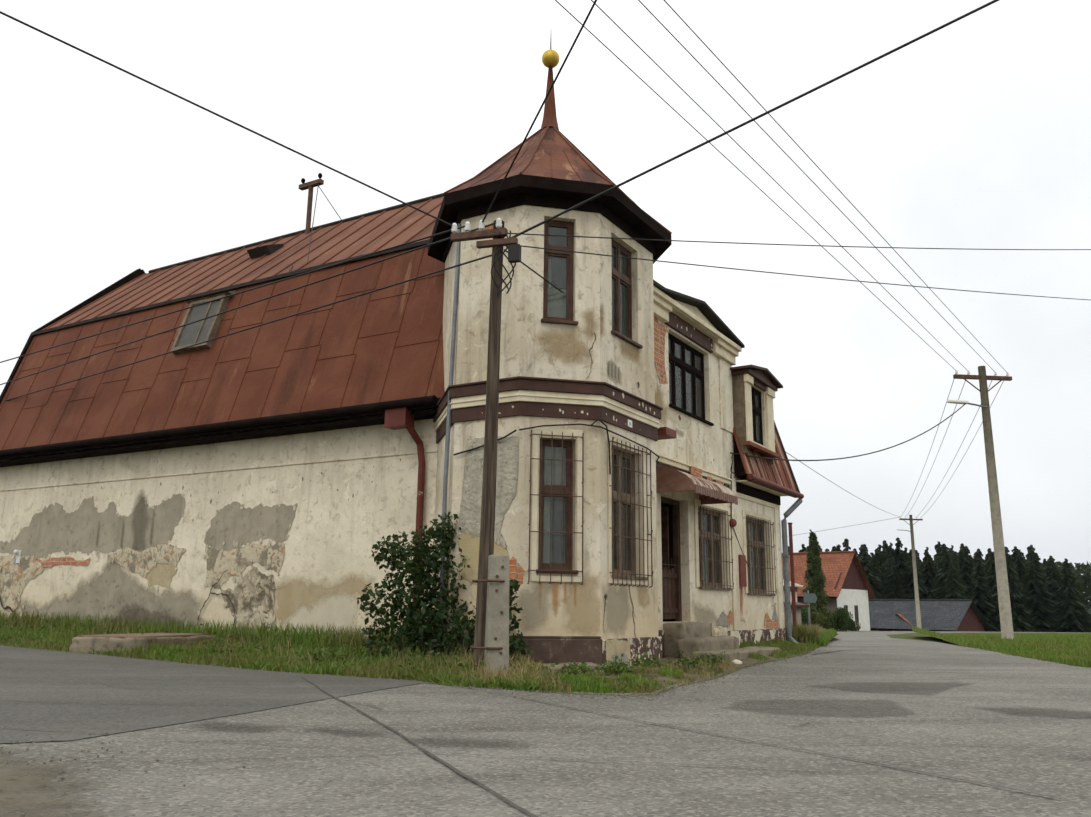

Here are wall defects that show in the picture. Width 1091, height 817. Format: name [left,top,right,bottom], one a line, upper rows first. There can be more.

flaking render [654,316,695,386]
peeling [0,483,194,620]
peeling [203,492,357,641]
spalling [458,435,484,538]
spalling [494,436,524,585]
spalling [603,593,660,666]